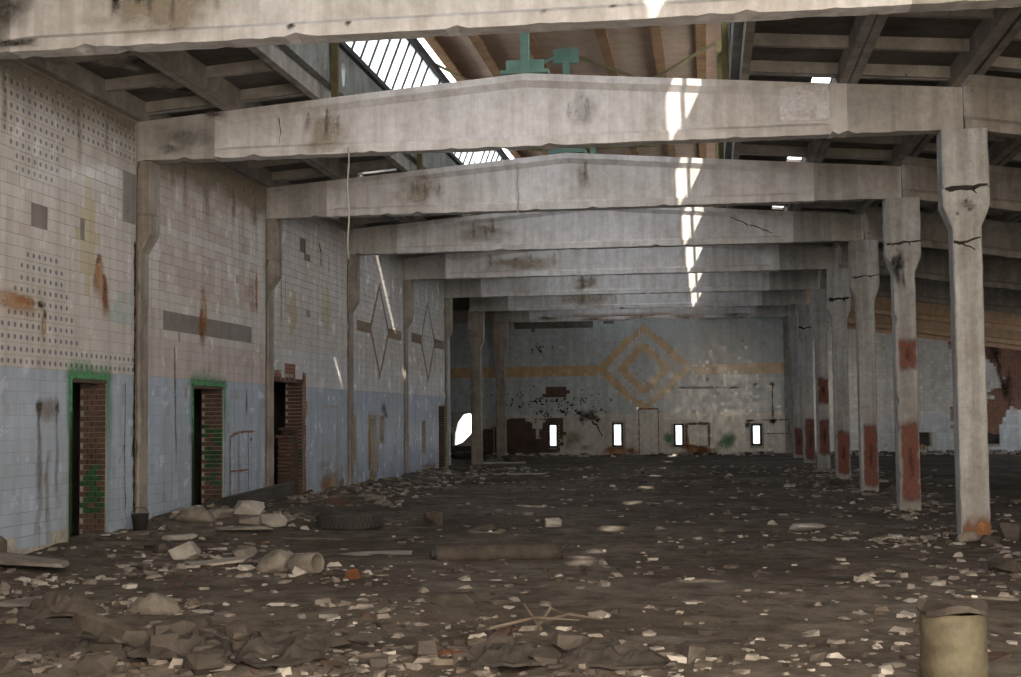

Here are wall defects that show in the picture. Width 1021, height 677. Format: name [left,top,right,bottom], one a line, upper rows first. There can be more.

crack [945,183,988,194]
crack [887,239,922,247]
crack [953,236,981,250]
corrosion [94,257,108,308]
flaking render [985,346,1021,434]
flaking render [483,386,612,455]
flaking render [451,432,471,453]